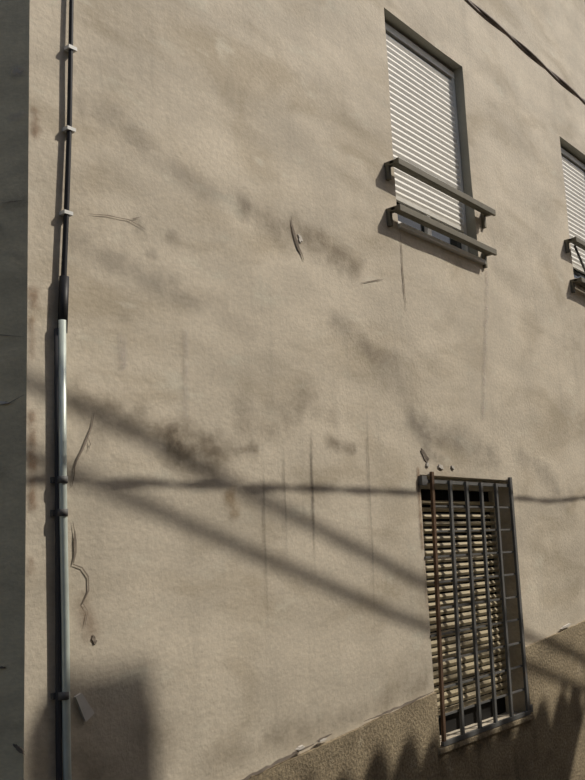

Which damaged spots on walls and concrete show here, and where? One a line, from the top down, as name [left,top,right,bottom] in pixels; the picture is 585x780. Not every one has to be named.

crack [72,523,89,624]